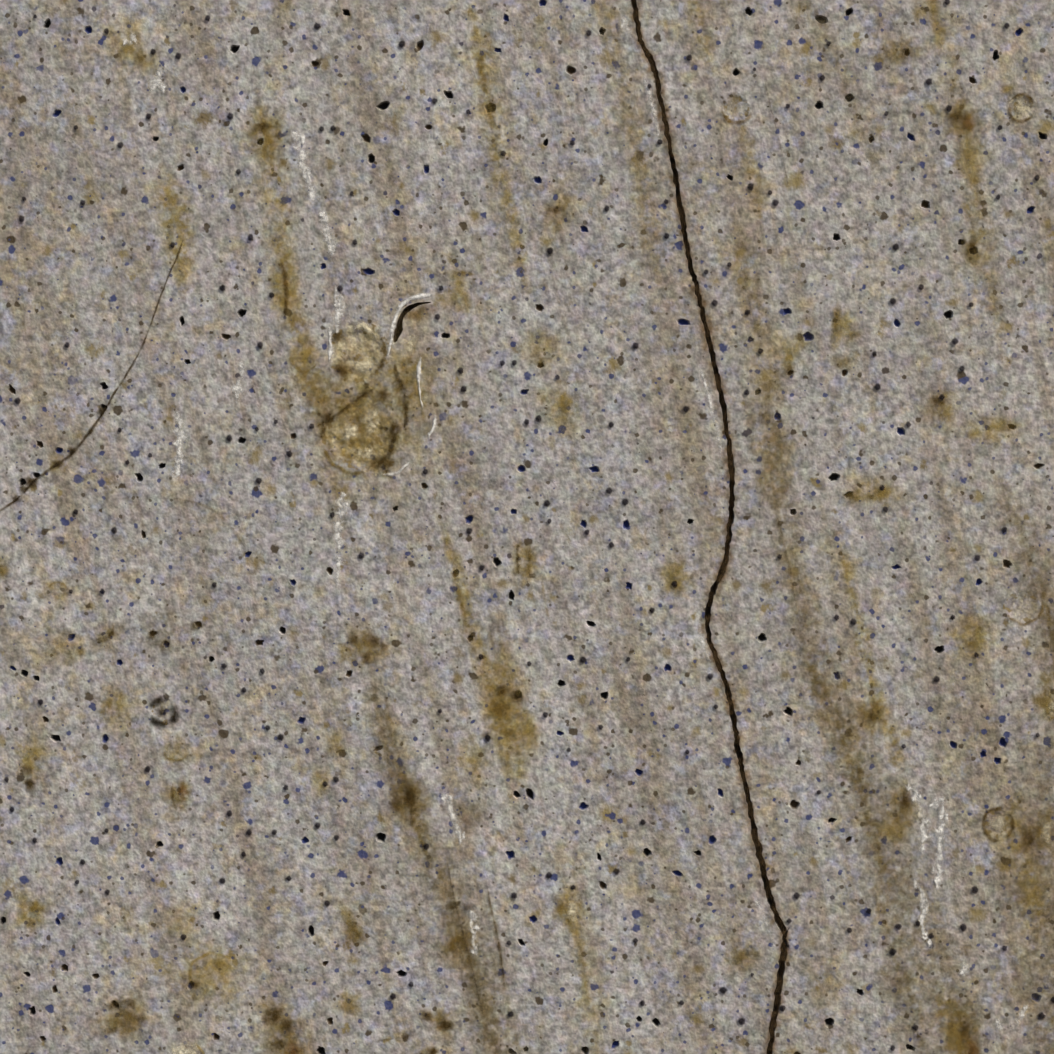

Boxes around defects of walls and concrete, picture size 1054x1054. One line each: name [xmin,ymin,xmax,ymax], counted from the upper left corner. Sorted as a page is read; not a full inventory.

spalling [320,294,431,477]
crack [621,0,789,1054]